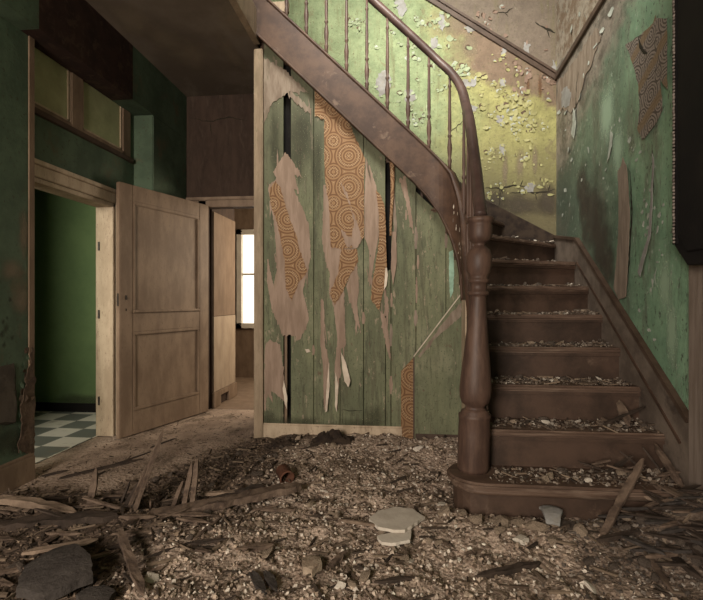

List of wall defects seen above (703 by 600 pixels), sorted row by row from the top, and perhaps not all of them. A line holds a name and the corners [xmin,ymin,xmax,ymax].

flaking render [393,0,408,19]
peeling [414,5,456,51]
peeling [464,5,505,33]
flaking render [374,58,427,126]
peeling [451,47,549,170]
peeling [486,178,554,201]
peeling [613,154,665,300]
flaking render [0,347,36,457]